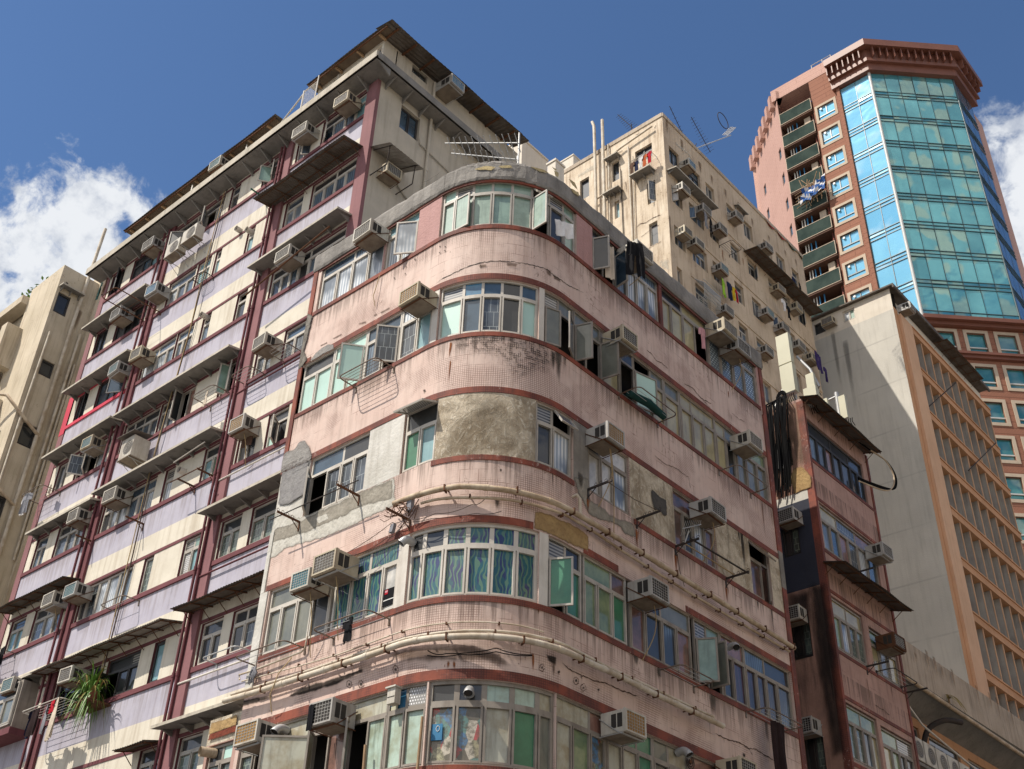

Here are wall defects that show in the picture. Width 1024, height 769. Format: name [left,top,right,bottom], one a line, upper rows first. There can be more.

crack [442,260,580,291]
water stain [454,336,566,375]
peeling [271,478,395,558]